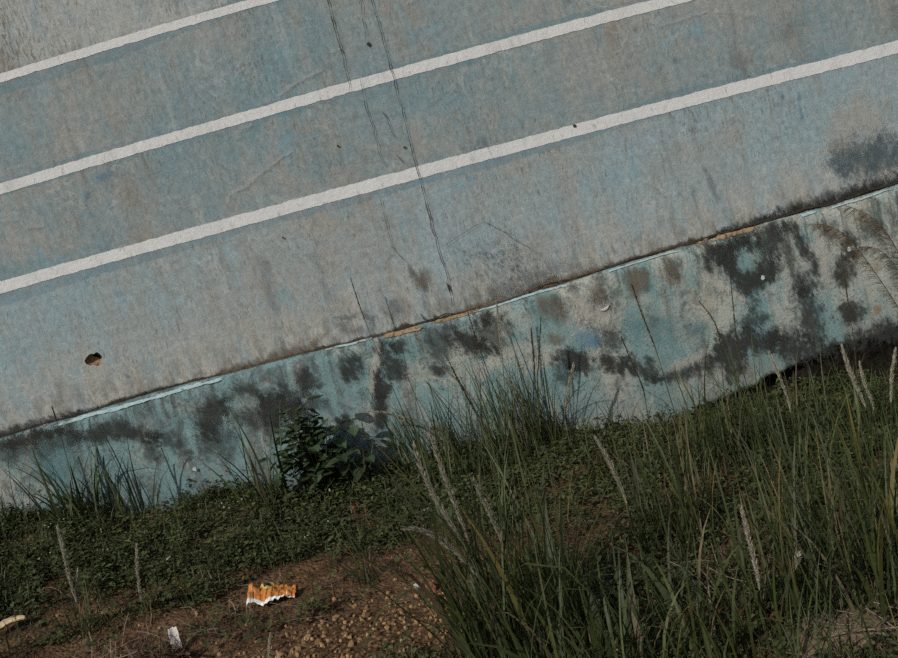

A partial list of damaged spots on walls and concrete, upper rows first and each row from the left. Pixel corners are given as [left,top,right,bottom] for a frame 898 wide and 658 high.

crack [327,0,540,336]
leakage [826,130,898,181]
leakage [549,214,898,385]
spalling [85,352,102,366]
leakage [0,416,190,462]
leakage [194,365,325,441]
leakage [334,336,406,432]
leakage [422,310,513,377]